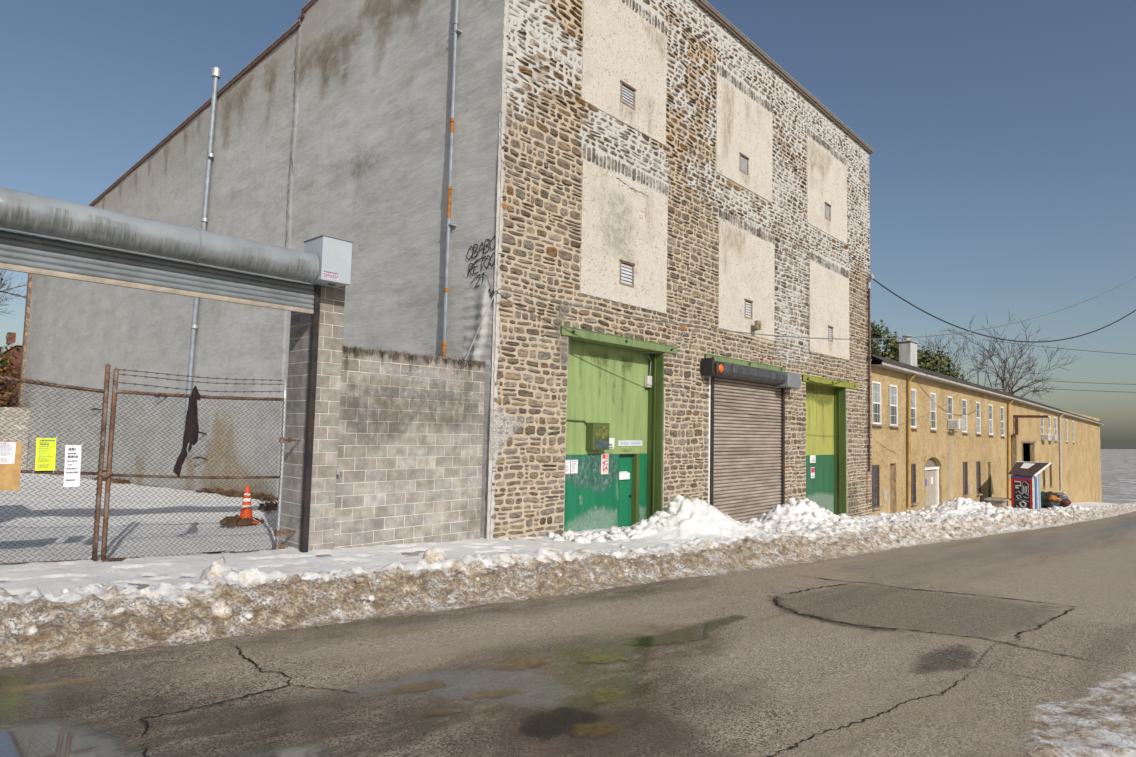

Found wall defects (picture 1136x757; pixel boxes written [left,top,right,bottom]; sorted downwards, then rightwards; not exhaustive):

crack [138,642,358,757]
crack [766,575,1111,757]